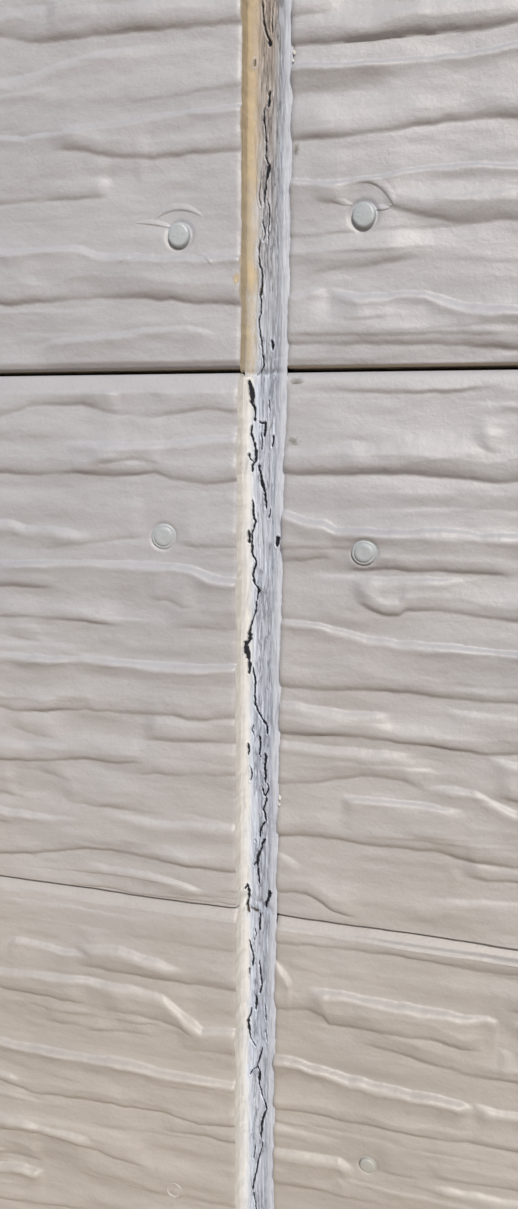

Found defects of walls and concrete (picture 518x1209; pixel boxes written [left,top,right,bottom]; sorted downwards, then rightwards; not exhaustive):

crack [262,2,273,42]
crack [244,110,274,1209]